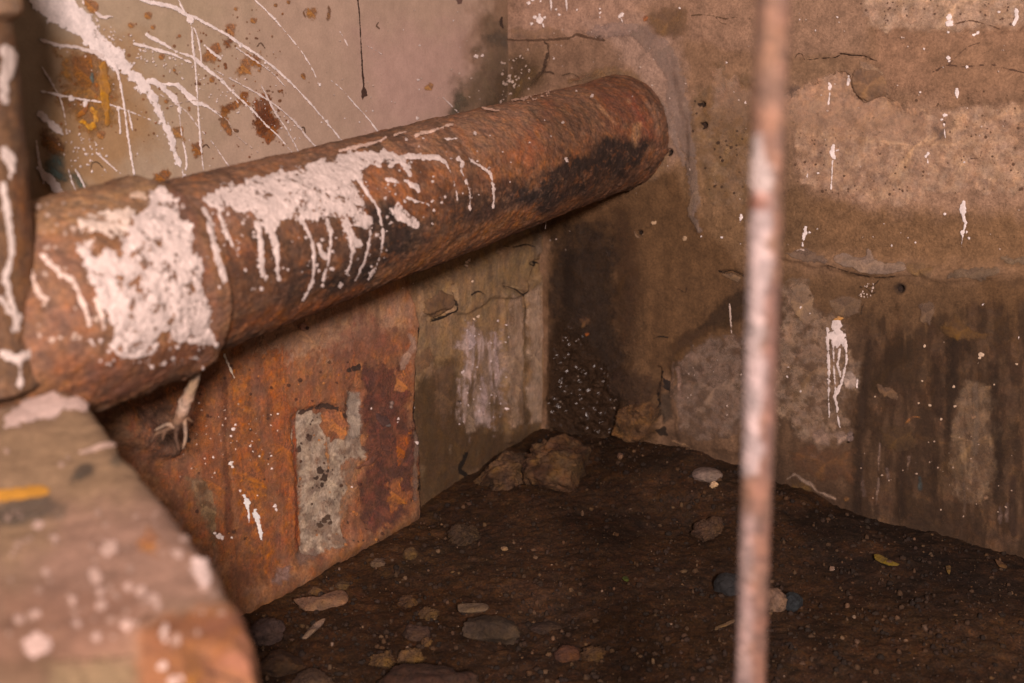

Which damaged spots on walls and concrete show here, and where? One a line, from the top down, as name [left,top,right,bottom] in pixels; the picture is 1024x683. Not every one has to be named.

corrosion [84,0,98,13]
corrosion [303,6,331,20]
corrosion [53,51,157,141]
corrosion [191,8,287,146]
crack [531,41,579,82]
crack [795,52,874,60]
crack [933,43,1024,73]
corrosion [172,121,214,159]
damp [775,279,1024,558]
corrosion [124,304,420,590]
spalling [290,391,367,556]
corrosion [156,661,202,683]